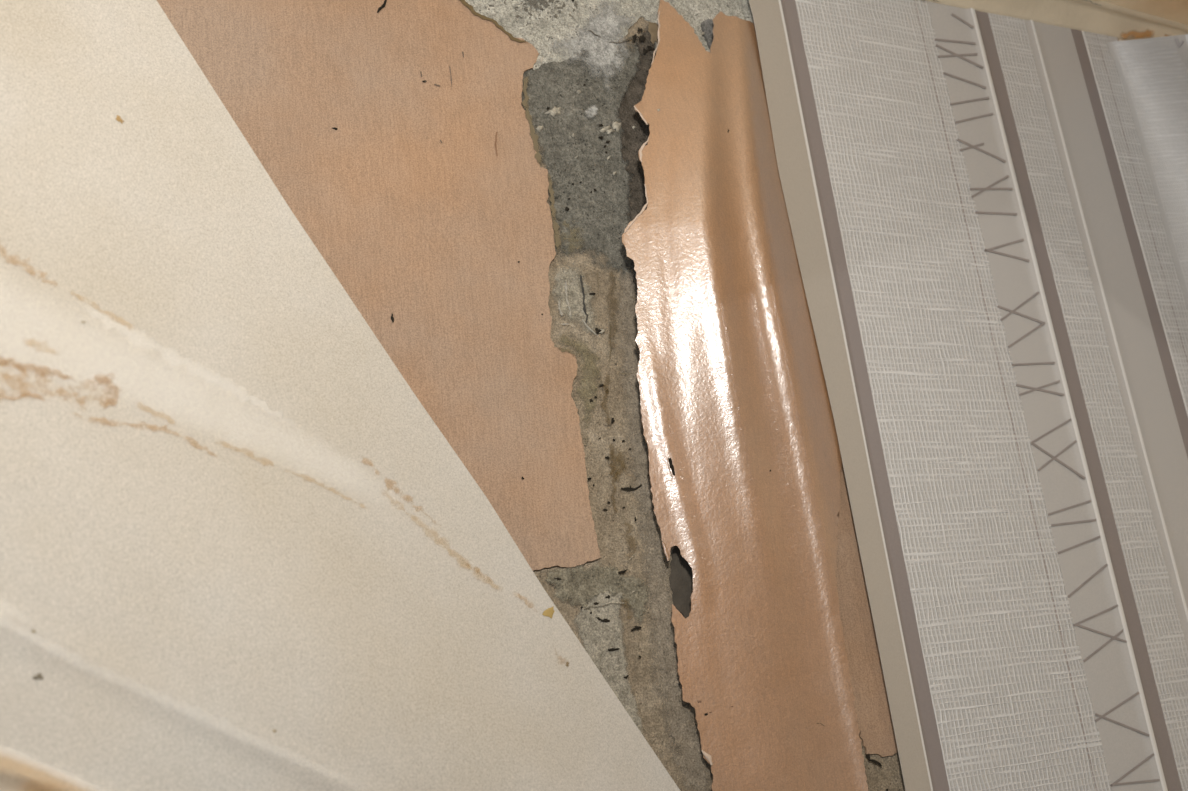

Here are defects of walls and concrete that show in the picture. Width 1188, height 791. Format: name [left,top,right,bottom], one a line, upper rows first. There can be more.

peeling [157,0,898,791]